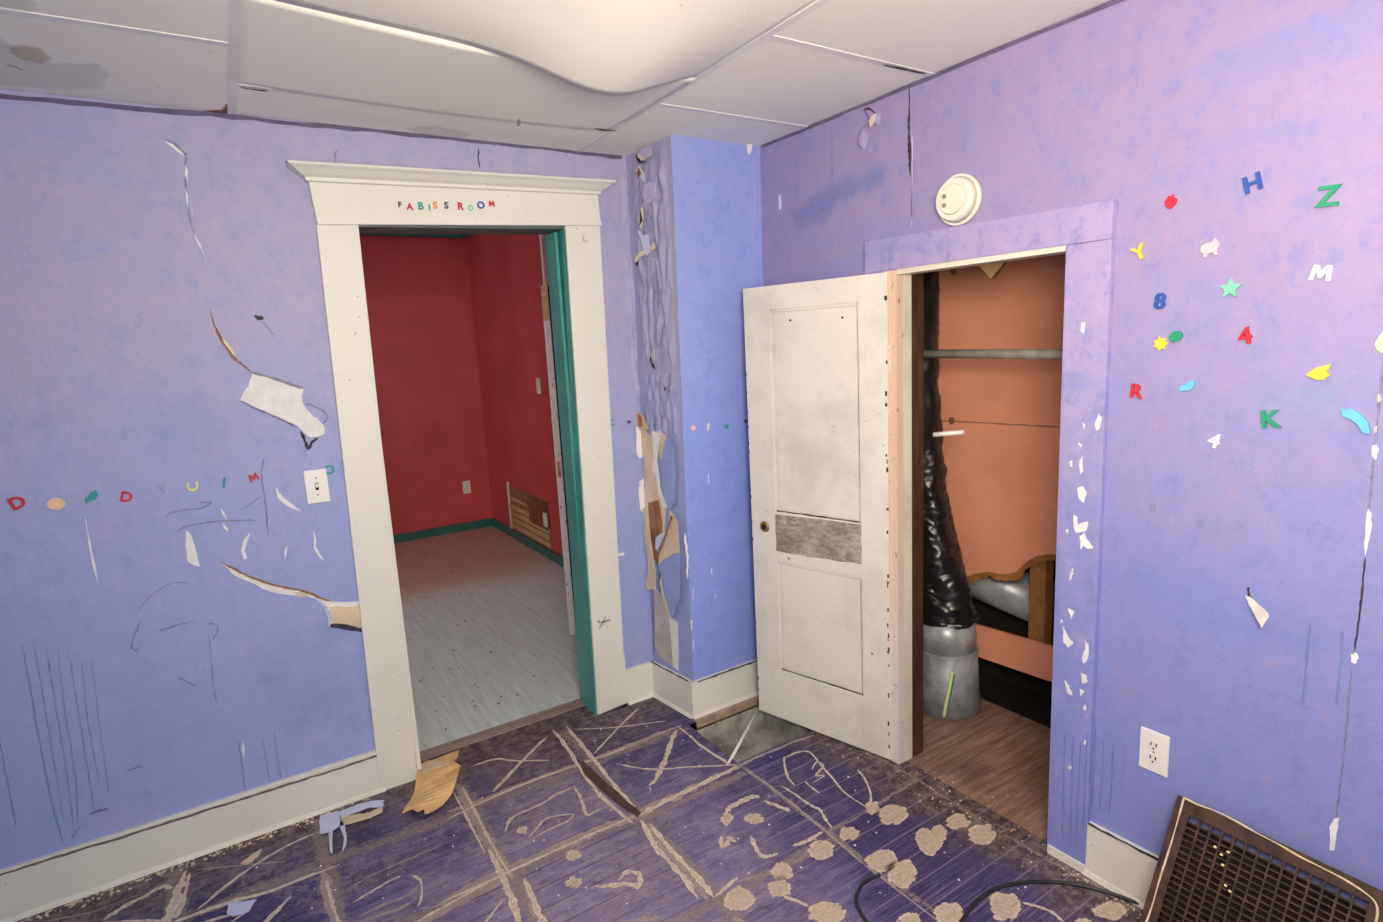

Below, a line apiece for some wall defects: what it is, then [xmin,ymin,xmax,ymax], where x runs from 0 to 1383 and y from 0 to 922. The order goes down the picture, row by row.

crack [753,0,1125,222]
peeling [635,147,656,266]
peeling [240,372,328,460]
crack [941,419,1060,427]
peeling [1065,414,1102,549]
peeling [221,533,362,632]
crack [1329,332,1383,851]
peeling [1061,608,1089,711]